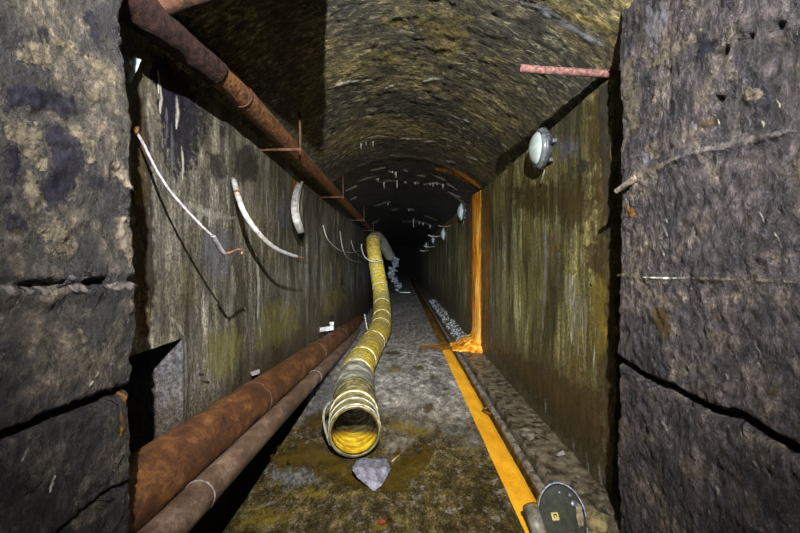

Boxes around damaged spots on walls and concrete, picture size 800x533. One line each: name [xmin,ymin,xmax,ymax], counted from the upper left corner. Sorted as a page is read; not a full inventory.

damp [204,266,247,379]
damp [255,254,298,350]
rust [420,167,492,353]
damp [499,83,737,485]
crack [624,358,800,450]